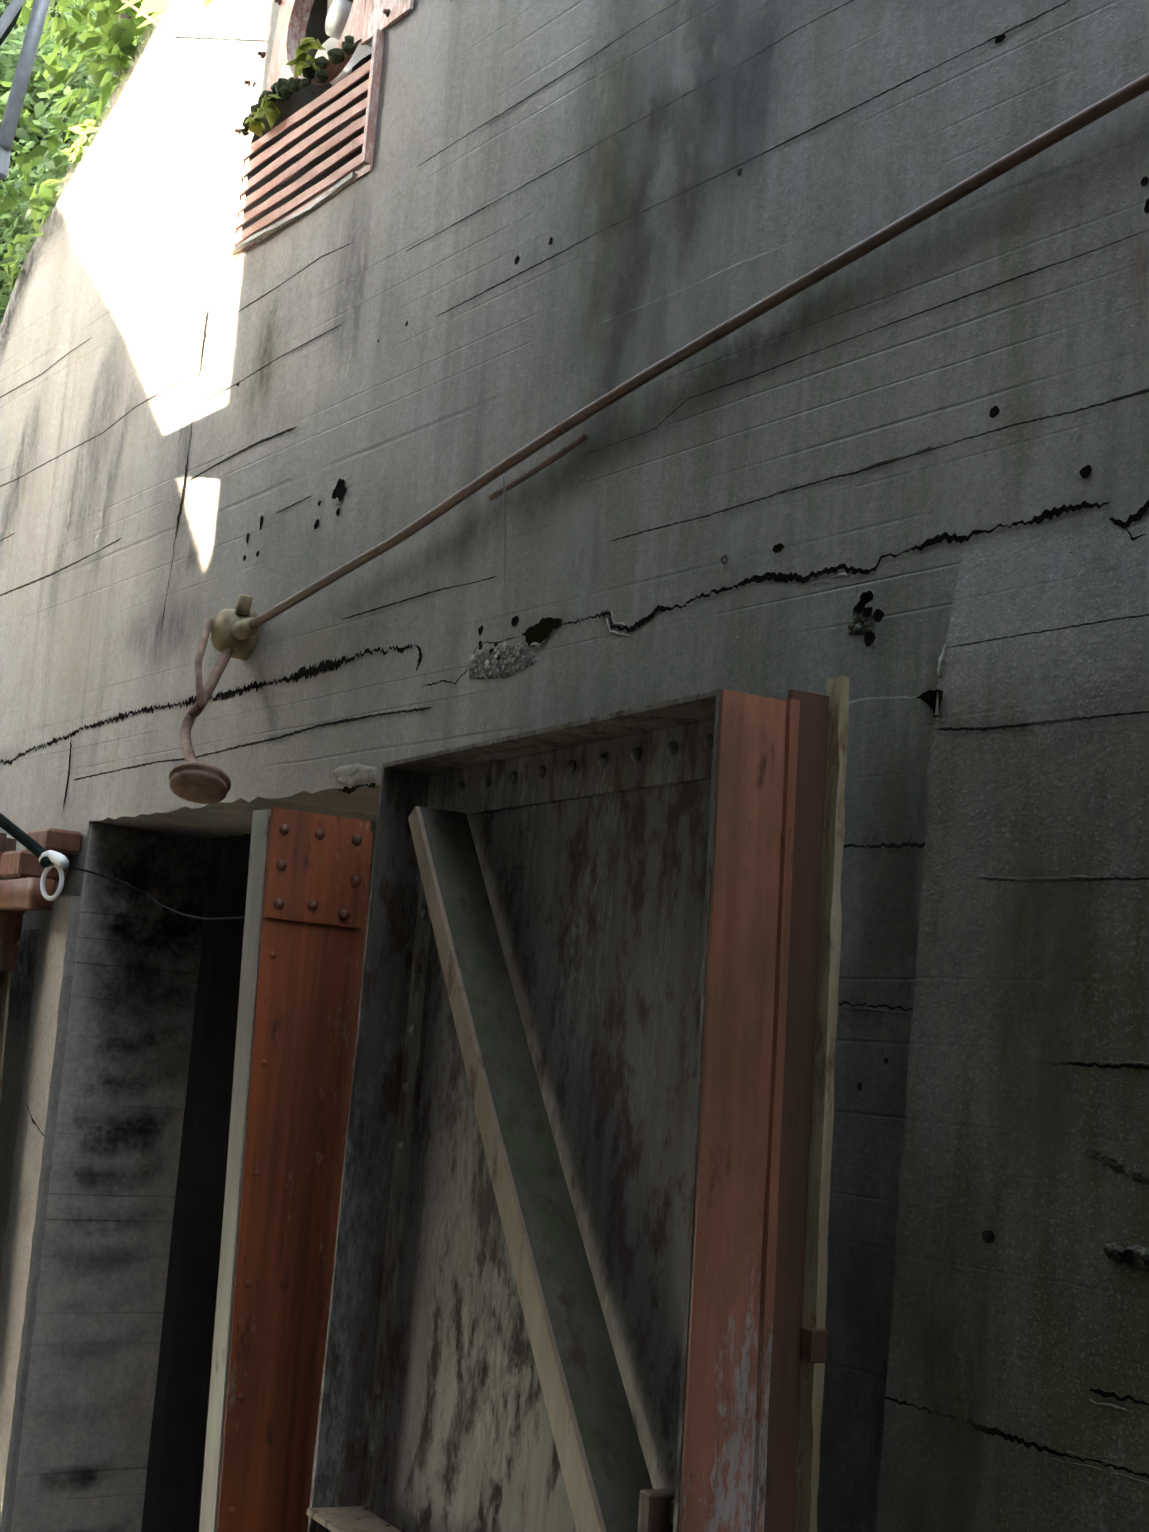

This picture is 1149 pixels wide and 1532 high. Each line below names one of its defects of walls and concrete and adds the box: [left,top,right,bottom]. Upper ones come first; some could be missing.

crack [161,307,208,626]
crack [562,499,1149,637]
spalling [469,615,562,679]
spalling [848,591,885,647]
crack [0,637,519,808]
crack [843,842,925,851]
crack [838,1001,913,1015]
crack [1038,1061,1149,1071]
spalling [1103,1242,1149,1272]
crack [1089,1389,1149,1412]
crack [885,1397,1149,1485]